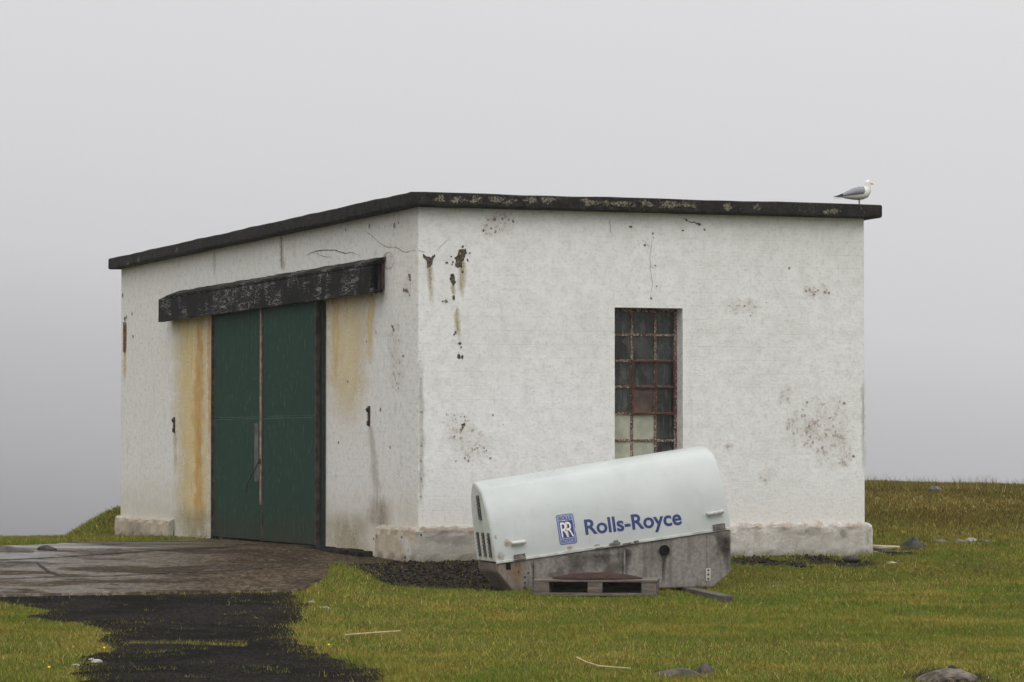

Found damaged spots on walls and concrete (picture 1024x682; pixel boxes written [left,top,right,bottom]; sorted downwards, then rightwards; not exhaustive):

crack [308,231,450,257]
rust [195,319,211,517]